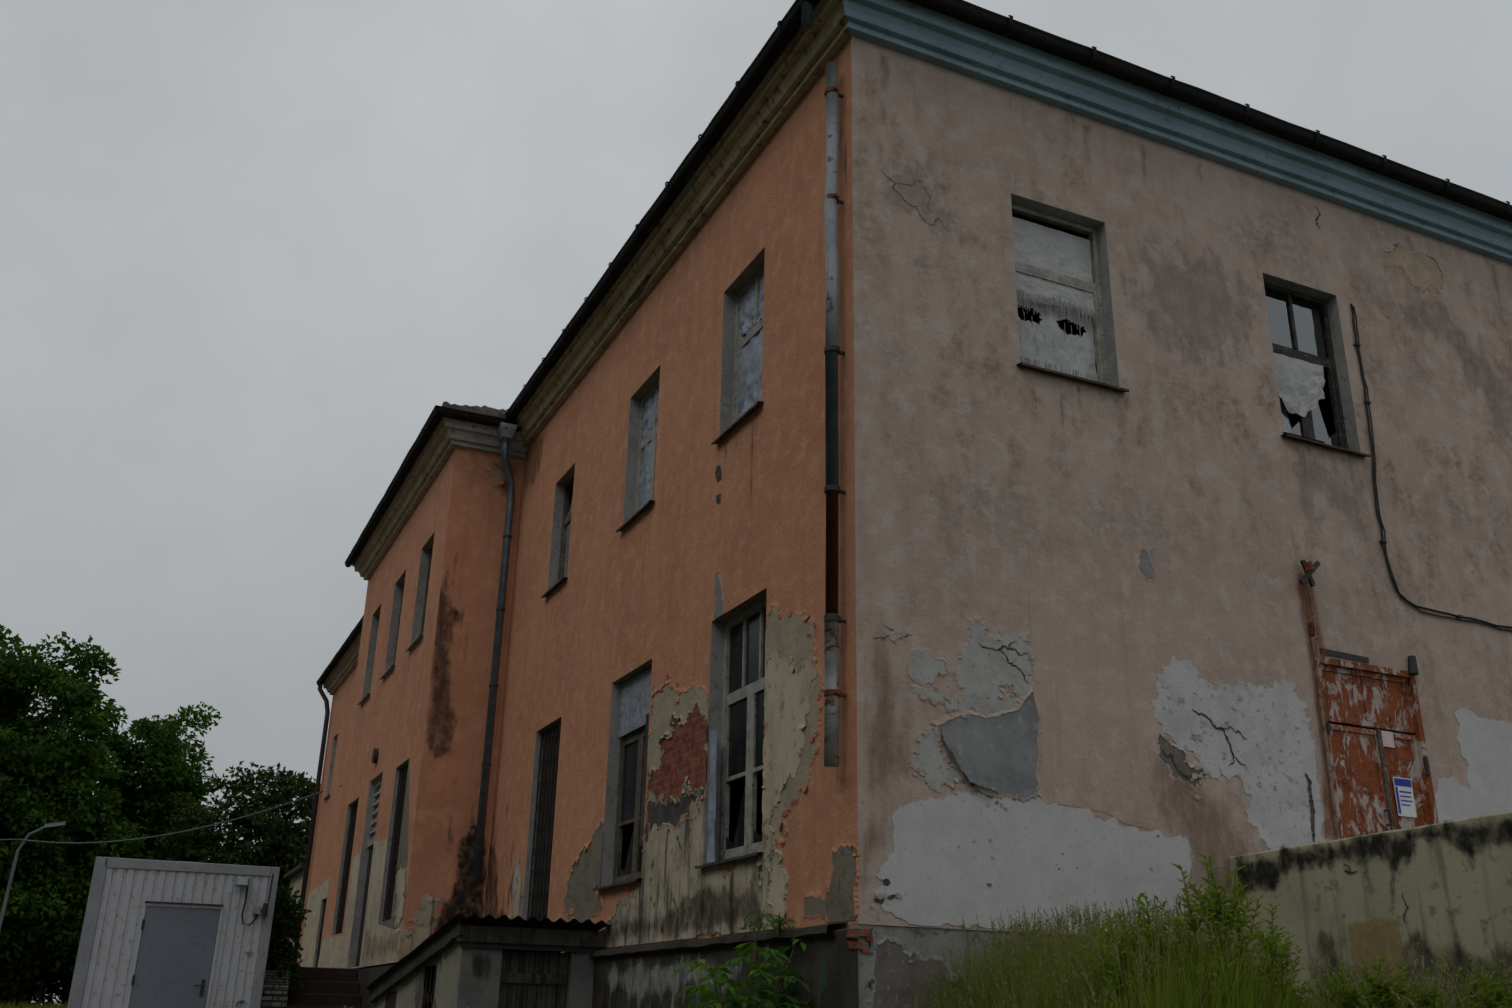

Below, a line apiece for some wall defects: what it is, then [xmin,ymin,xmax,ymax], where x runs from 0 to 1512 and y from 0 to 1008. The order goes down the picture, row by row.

crack [882,169,950,232]
water stain [429,591,457,756]
flaking render [641,673,709,853]
flaking render [762,601,825,847]
peeling [873,615,1037,814]
peeling [1155,726,1208,800]
water stain [435,826,509,932]
water stain [1237,819,1512,893]